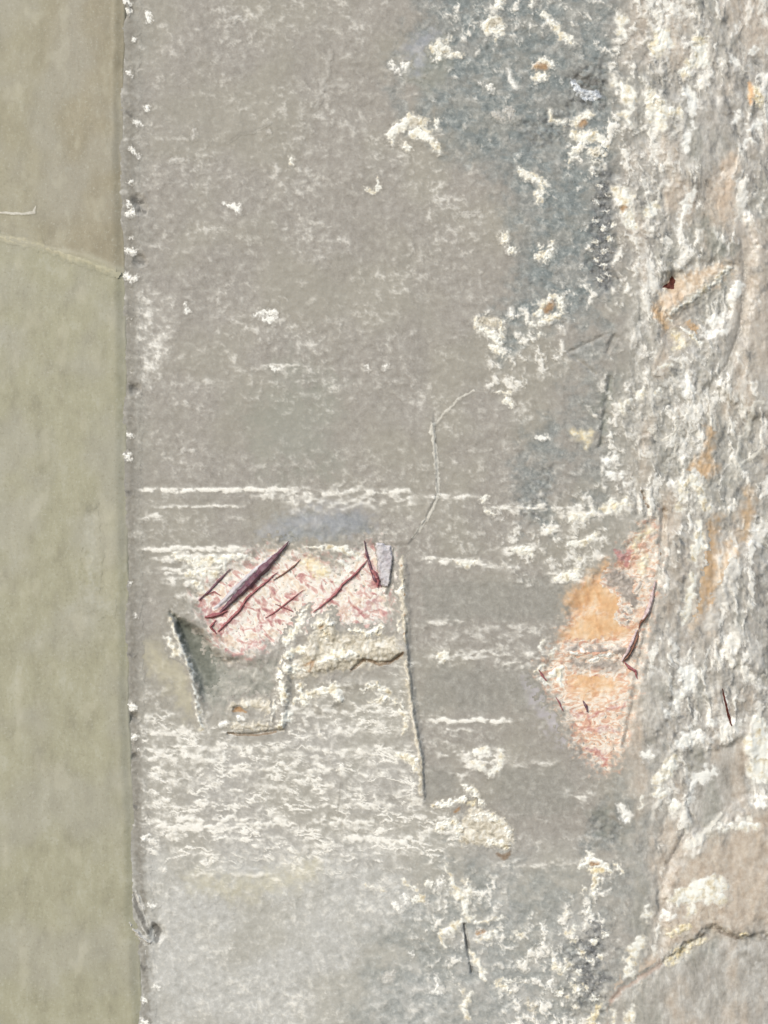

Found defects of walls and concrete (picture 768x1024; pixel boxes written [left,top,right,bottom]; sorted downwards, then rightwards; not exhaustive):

crack [410,388,476,540]
damp [191,486,386,658]
peeling [542,506,601,586]
damp [599,563,646,629]
spalling [159,605,294,738]
peeling [532,637,613,689]
damp [512,664,630,772]
damp [579,793,626,851]
damp [173,842,336,916]
crack [713,924,749,942]
crack [604,956,663,1024]